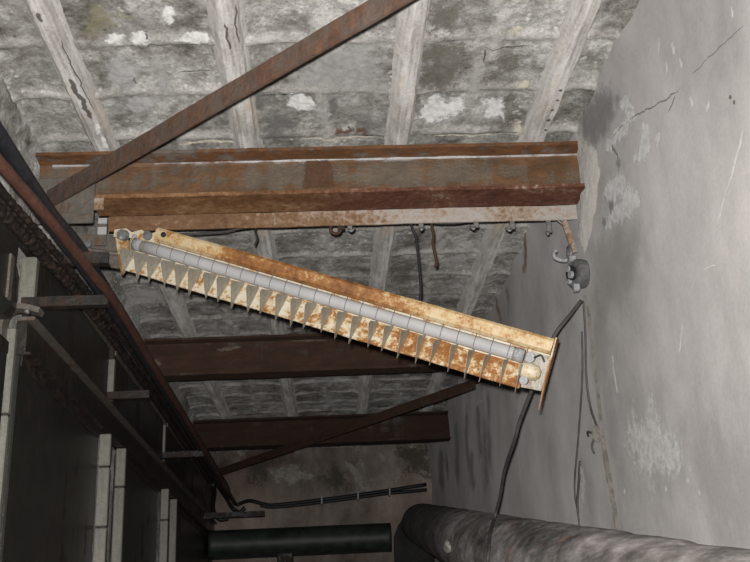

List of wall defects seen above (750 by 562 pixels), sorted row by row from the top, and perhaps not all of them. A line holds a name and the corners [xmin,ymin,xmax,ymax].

crack [61,41,92,119]
leakage [105,30,150,46]
leakage [162,6,176,25]
leakage [173,31,210,44]
leakage [287,41,384,123]
leakage [417,0,530,137]
leakage [583,94,660,162]
crack [612,90,679,159]
rust [303,160,334,188]
leakage [628,394,683,475]